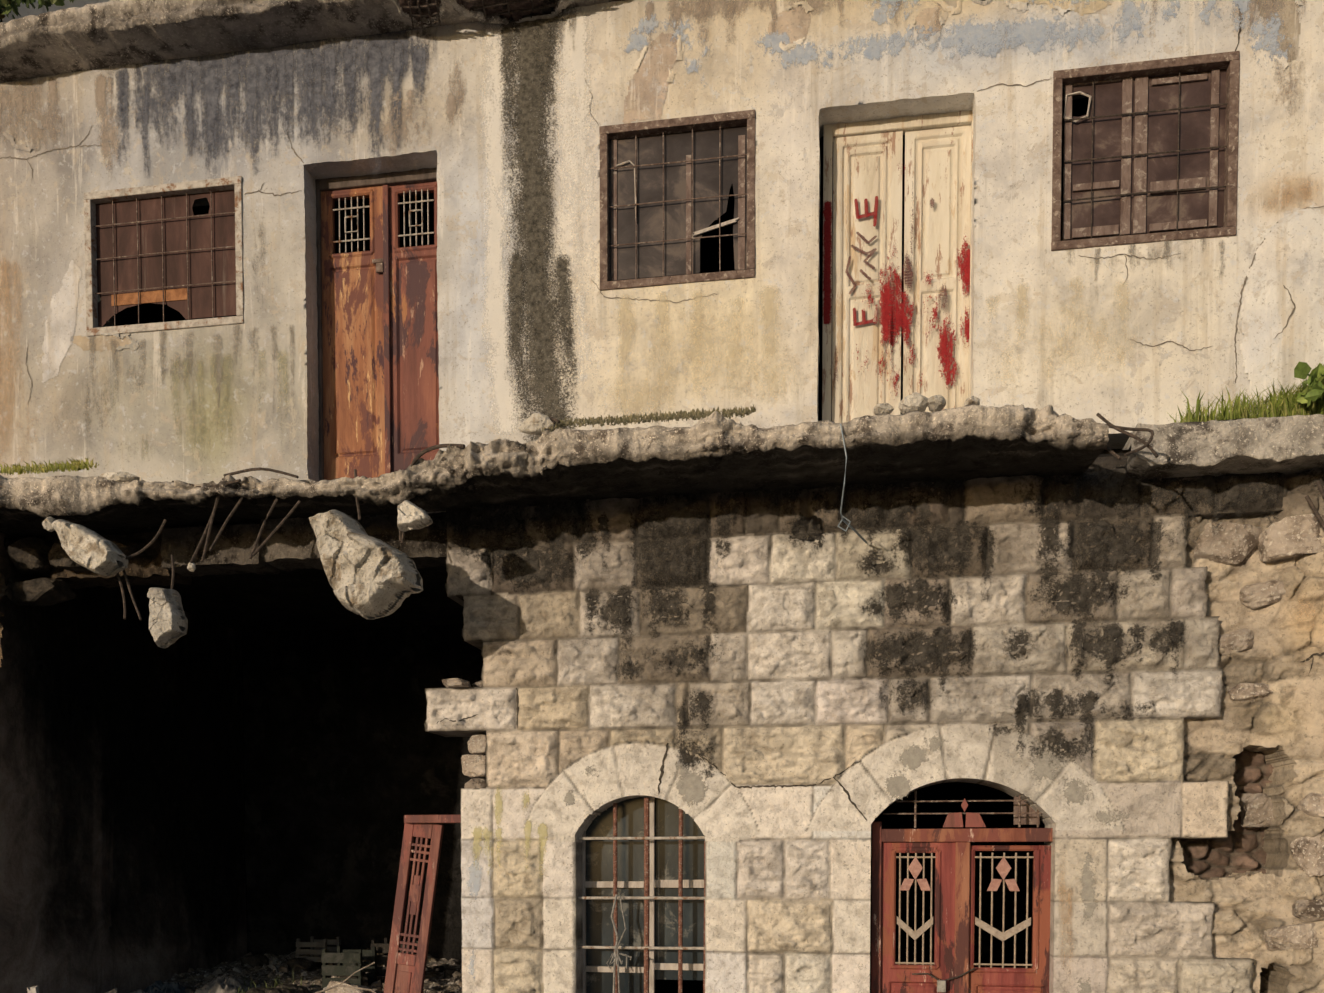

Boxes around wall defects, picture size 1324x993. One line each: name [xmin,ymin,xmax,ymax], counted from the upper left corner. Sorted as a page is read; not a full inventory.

peeling [757,0,1303,70]
crack [0,126,102,180]
damp [95,29,434,172]
damp [480,7,595,443]
spalling [5,537,91,606]
spalling [170,467,301,589]
damp [450,500,612,592]
damp [585,480,995,780]
damp [989,458,1324,763]
crack [1301,652,1324,673]
spalling [1178,750,1274,880]
spalling [1259,964,1273,992]